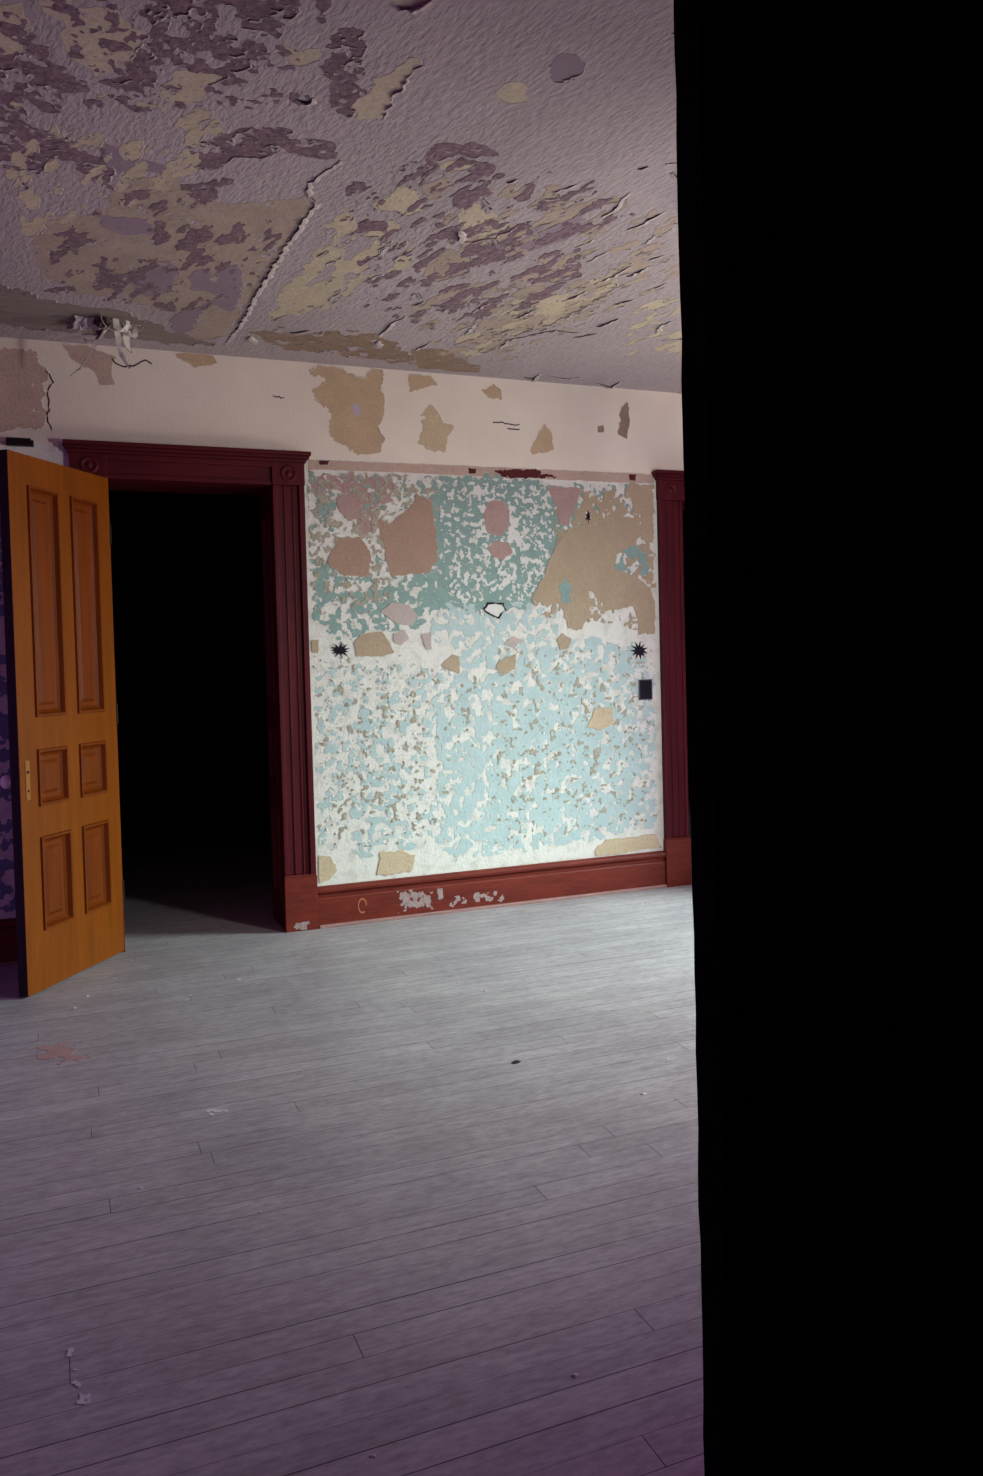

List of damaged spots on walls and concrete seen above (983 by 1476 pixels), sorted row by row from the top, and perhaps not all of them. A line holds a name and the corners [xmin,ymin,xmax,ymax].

peeling [0,0,682,913]